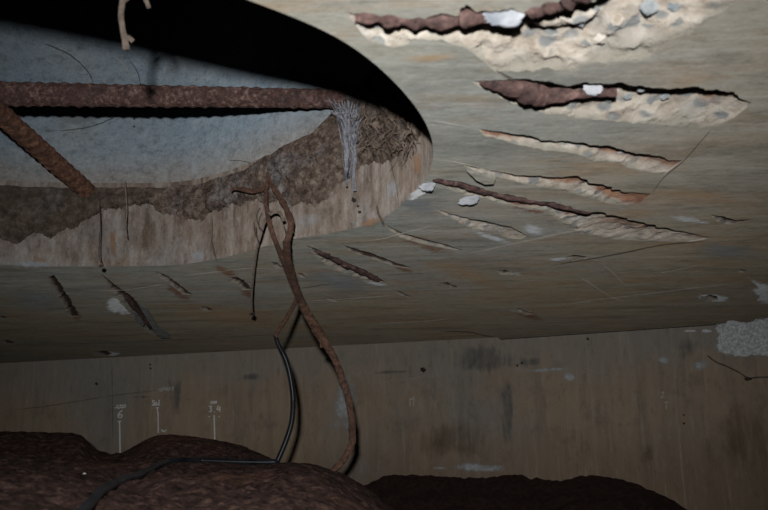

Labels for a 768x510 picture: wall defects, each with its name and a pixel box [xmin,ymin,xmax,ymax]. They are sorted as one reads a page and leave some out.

spalling [346,0,751,128]
spalling [0,81,346,198]
spalling [478,129,682,175]
spalling [418,165,711,242]
spalling [306,245,384,282]
spalling [47,275,79,317]
spalling [102,275,171,338]
leakage [685,318,768,357]